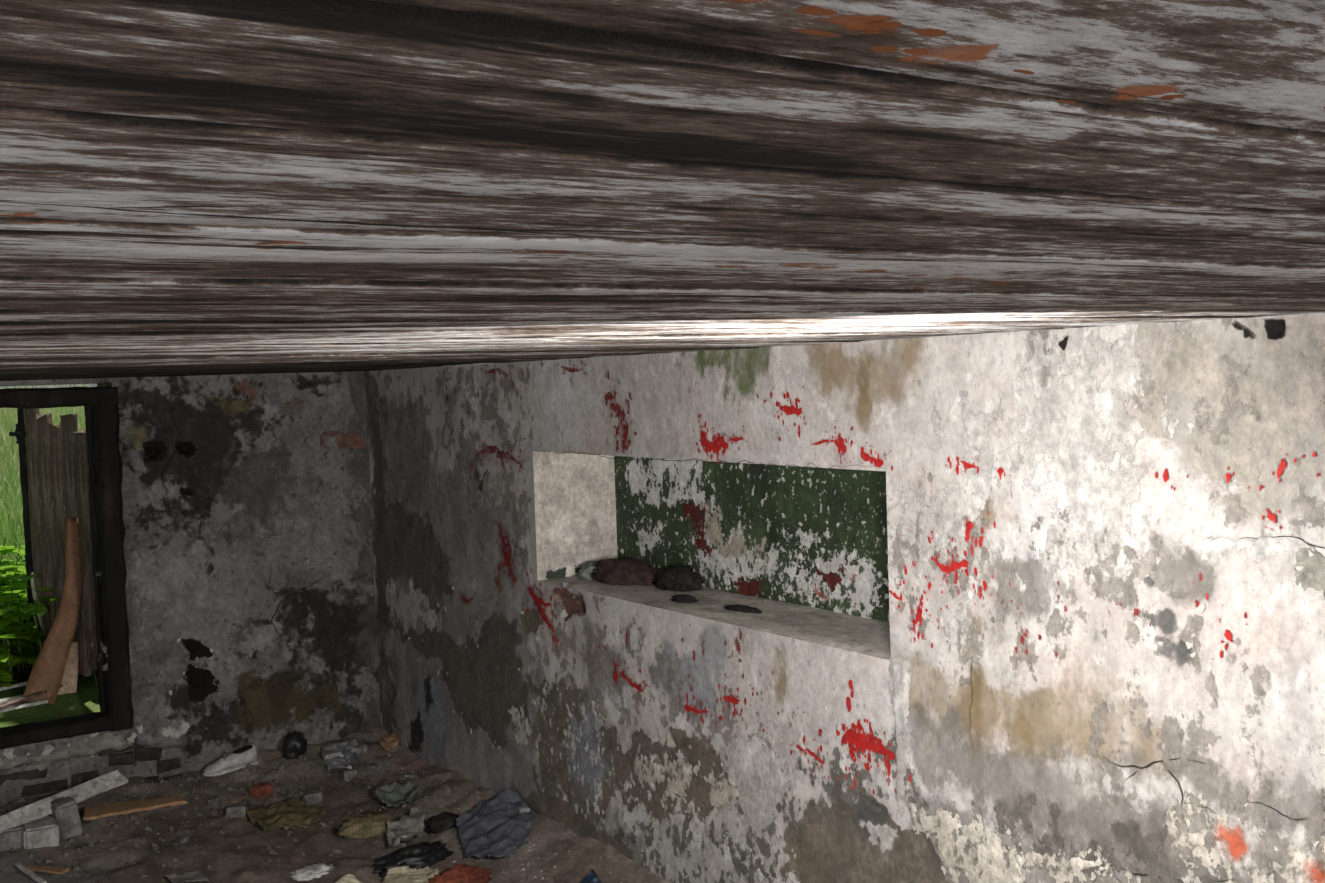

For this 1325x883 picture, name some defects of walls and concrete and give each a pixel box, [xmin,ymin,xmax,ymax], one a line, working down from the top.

peeling [1187,355,1255,452]
damp [105,370,548,801]
peeling [1209,479,1249,528]
crack [1206,536,1325,549]
spalling [1290,484,1325,600]
spalling [177,638,219,702]
peeling [946,510,1325,883]
damp [907,671,1325,883]
crack [1104,757,1306,830]